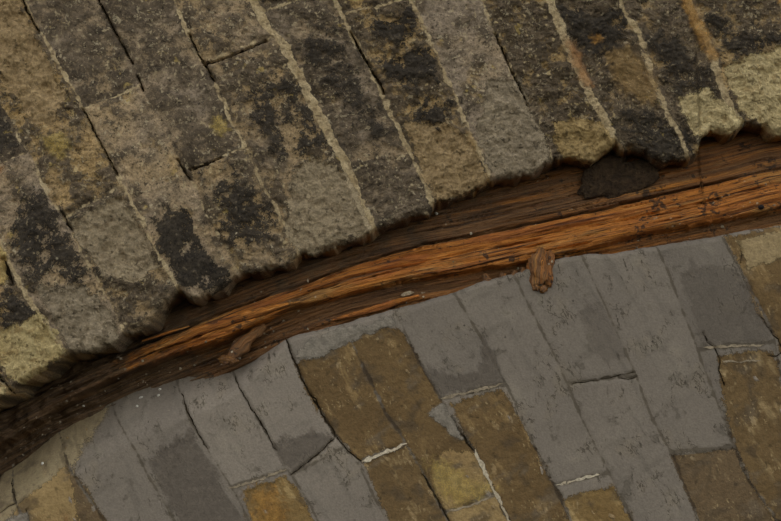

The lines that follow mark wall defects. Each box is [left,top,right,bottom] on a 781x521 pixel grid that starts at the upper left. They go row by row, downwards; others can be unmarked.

damp [9,186,101,292]
damp [150,202,233,301]
crack [177,158,221,179]
crack [190,36,264,81]
damp [198,164,280,252]
damp [244,64,329,165]
damp [291,13,394,145]
damp [370,6,465,132]
damp [556,0,628,64]
damp [620,108,699,164]
damp [0,287,42,329]
crack [703,333,725,386]